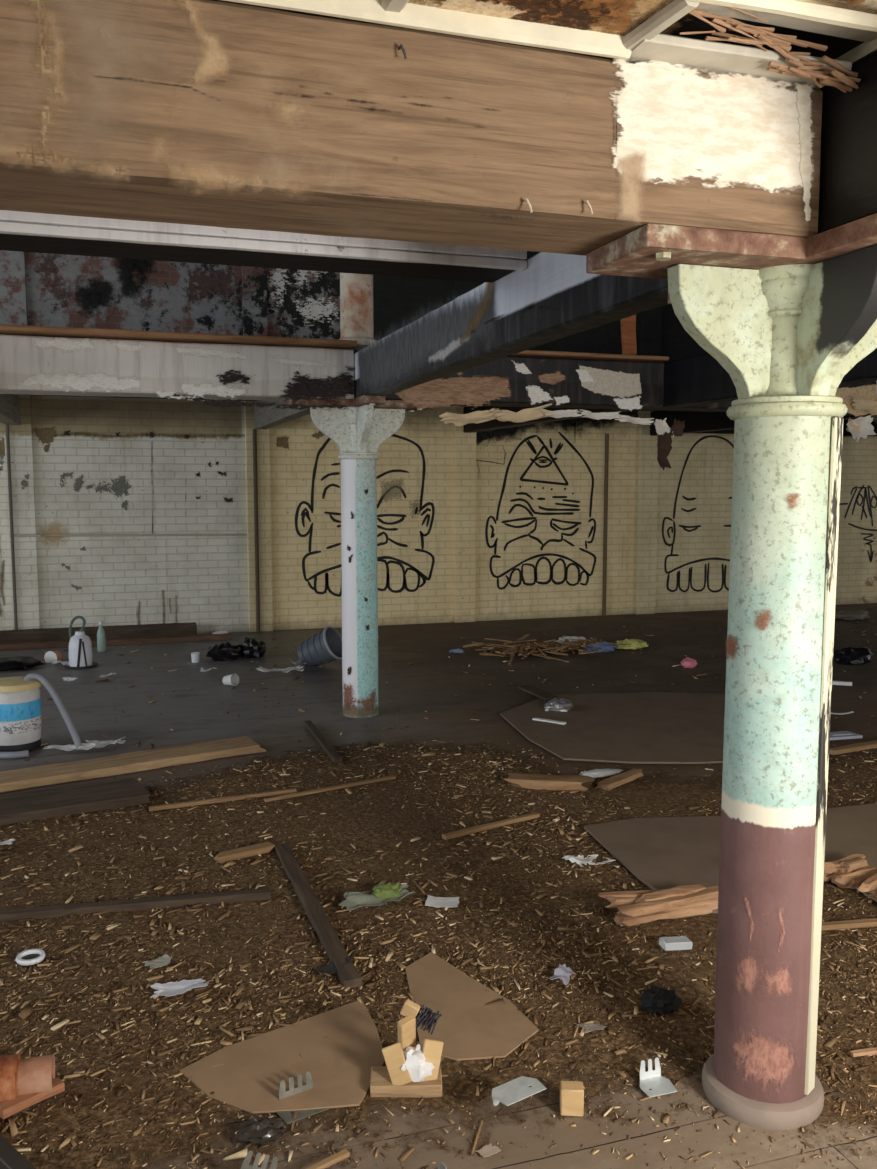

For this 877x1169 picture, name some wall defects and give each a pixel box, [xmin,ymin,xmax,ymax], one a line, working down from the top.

peeling [610,59,815,221]
spalling [184,264,241,312]
peeling [267,268,340,326]
peeling [32,337,95,352]
peeling [18,371,247,401]
spalling [33,426,56,452]
peeling [439,360,686,470]
peeling [835,381,877,442]
peeling [60,472,132,511]
corrosion [342,684,378,718]
corrosion [736,957,792,995]
corrosion [733,1029,793,1090]